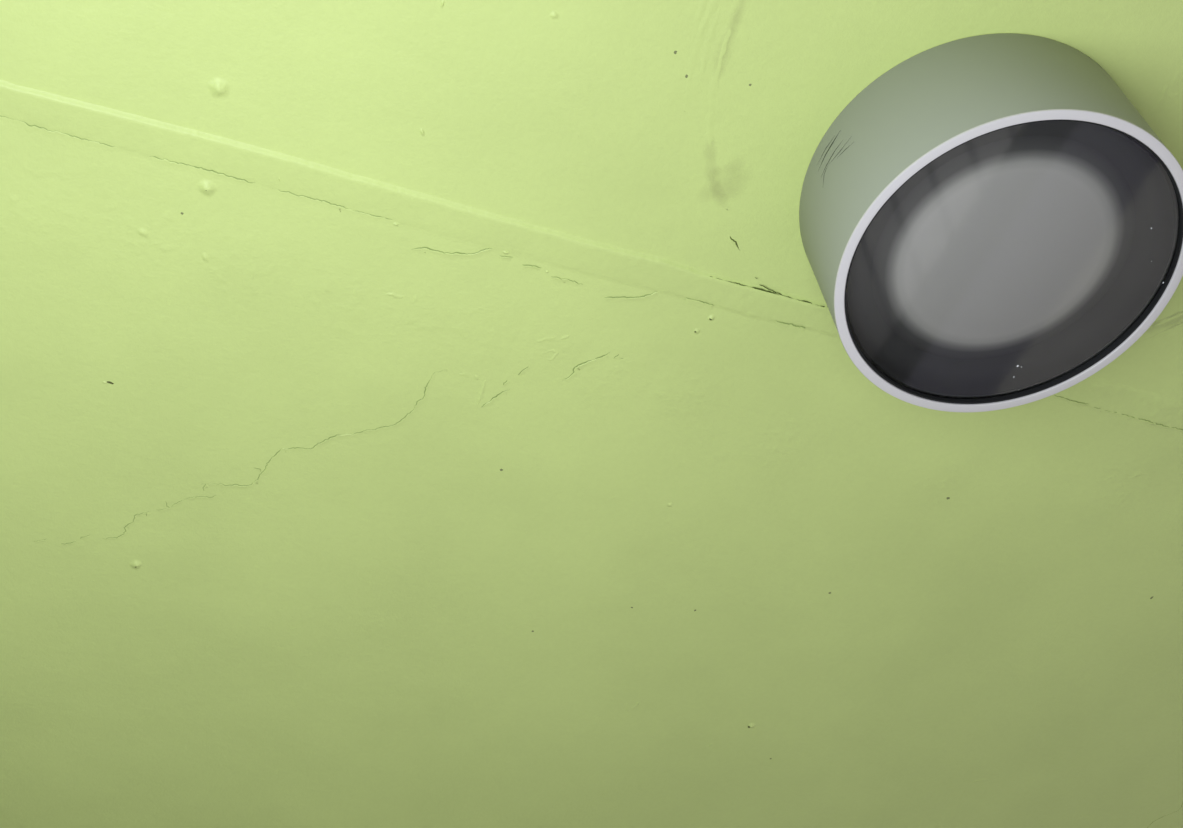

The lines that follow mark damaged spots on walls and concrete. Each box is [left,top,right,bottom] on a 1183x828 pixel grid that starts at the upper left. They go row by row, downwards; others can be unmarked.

crack [727,236,740,251]
crack [411,247,825,332]
crack [562,352,624,382]
crack [33,370,446,547]